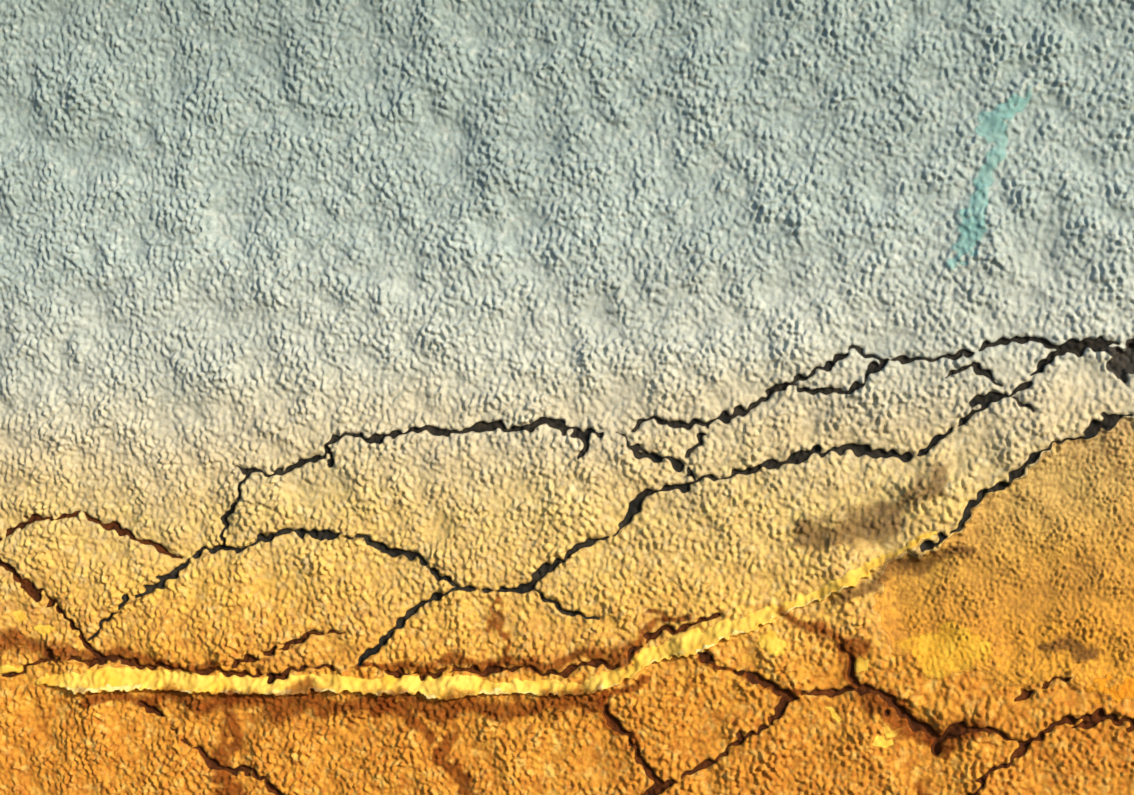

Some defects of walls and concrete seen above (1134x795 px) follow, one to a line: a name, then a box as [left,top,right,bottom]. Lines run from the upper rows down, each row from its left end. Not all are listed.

crack [0,335,1134,795]
rust [355,594,692,674]
rust [80,676,650,795]